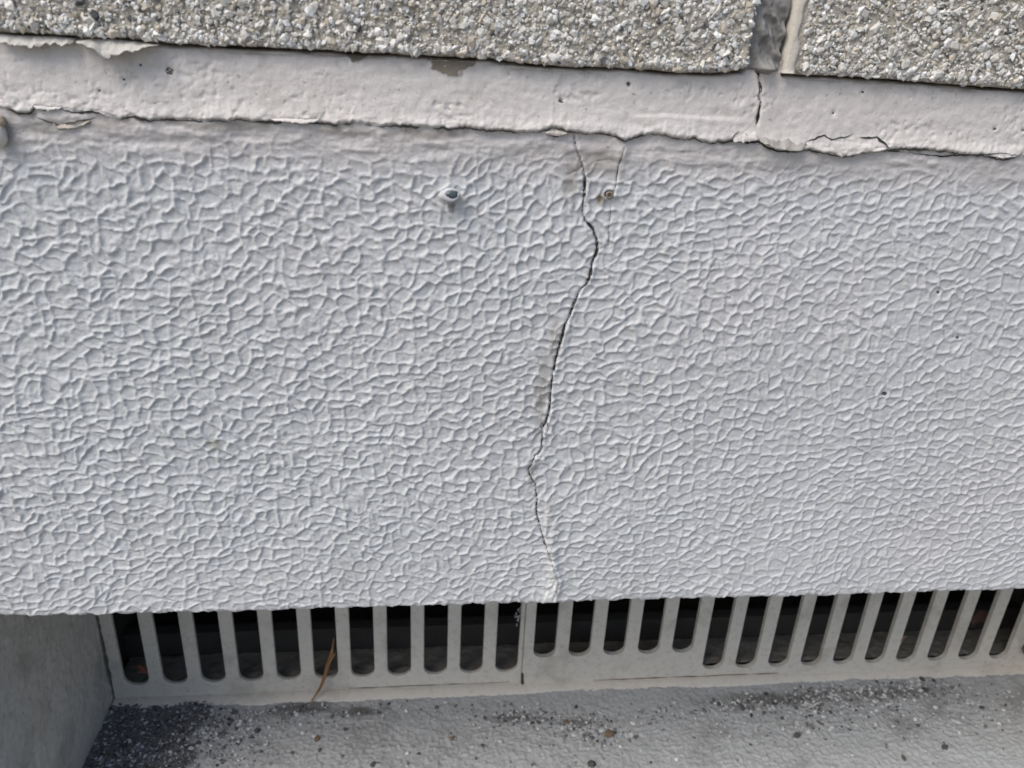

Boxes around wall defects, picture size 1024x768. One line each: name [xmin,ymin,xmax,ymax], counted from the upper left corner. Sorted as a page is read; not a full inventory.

peeling [33,105,90,129]
crack [2,108,285,125]
peeling [733,131,887,157]
crack [310,73,1021,595]